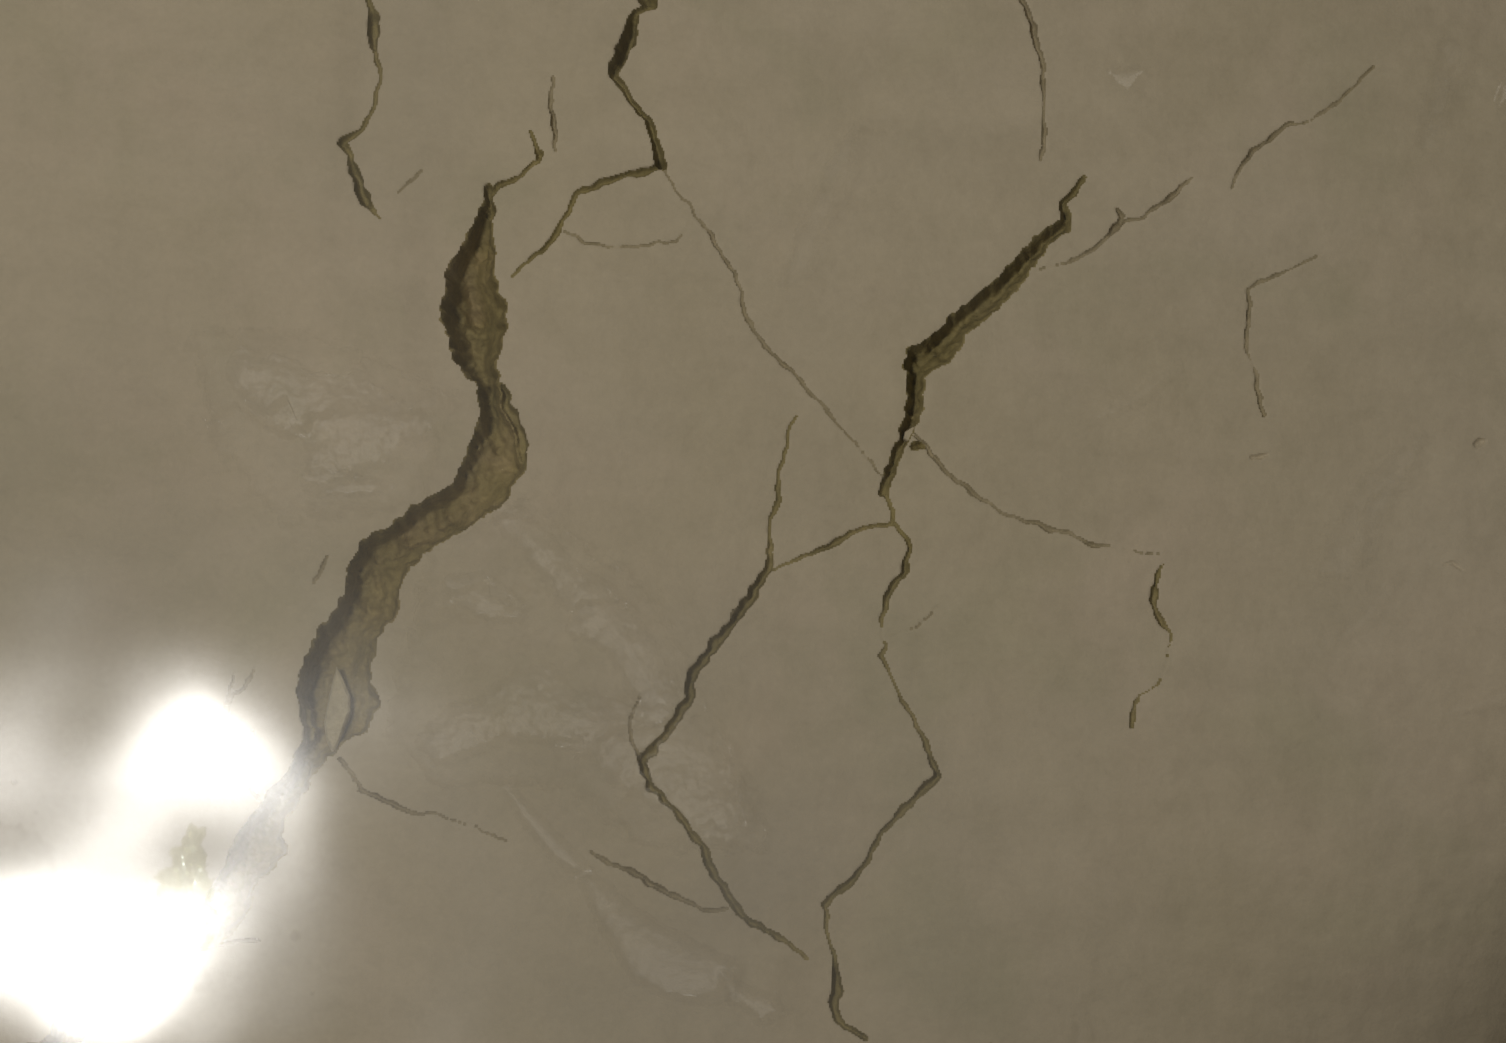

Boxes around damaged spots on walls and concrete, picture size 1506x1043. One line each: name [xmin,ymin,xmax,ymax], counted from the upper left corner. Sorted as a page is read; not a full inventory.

crack [1231,65,1375,189]
crack [1244,254,1318,417]
crack [27,0,1193,1043]